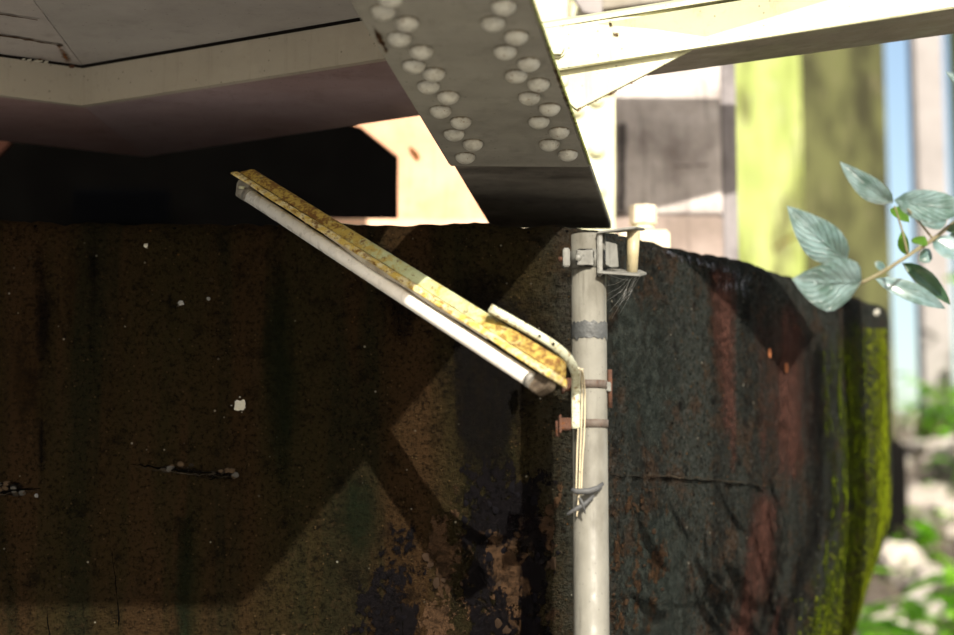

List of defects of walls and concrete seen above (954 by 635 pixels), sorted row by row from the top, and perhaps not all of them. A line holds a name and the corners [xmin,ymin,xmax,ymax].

corrosion [711,270,735,446]
corrosion [775,311,803,476]
crack [608,473,774,492]